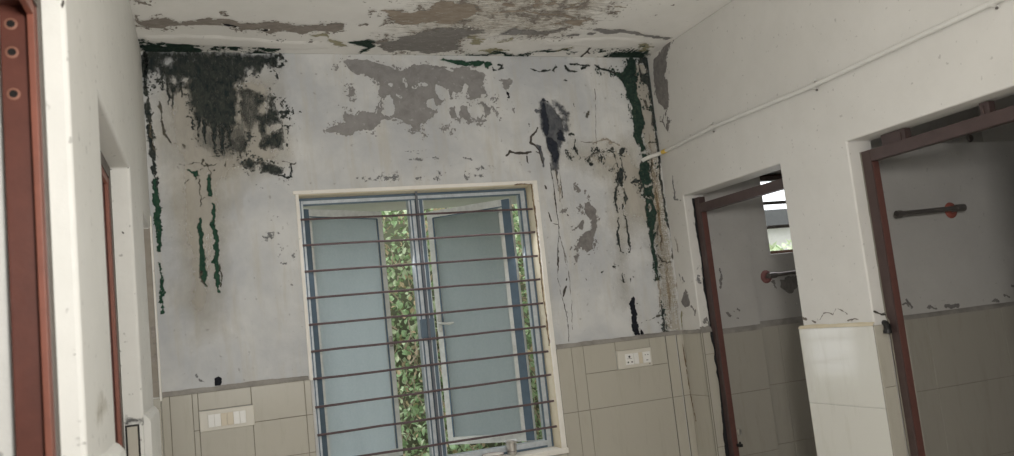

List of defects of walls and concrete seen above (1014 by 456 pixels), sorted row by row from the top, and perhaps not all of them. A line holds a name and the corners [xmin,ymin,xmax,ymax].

peeling [130,0,674,140]
leakage [138,39,302,398]
leakage [441,43,673,281]
peeling [560,182,600,265]
leakage [640,300,668,335]
peeling [771,276,798,305]